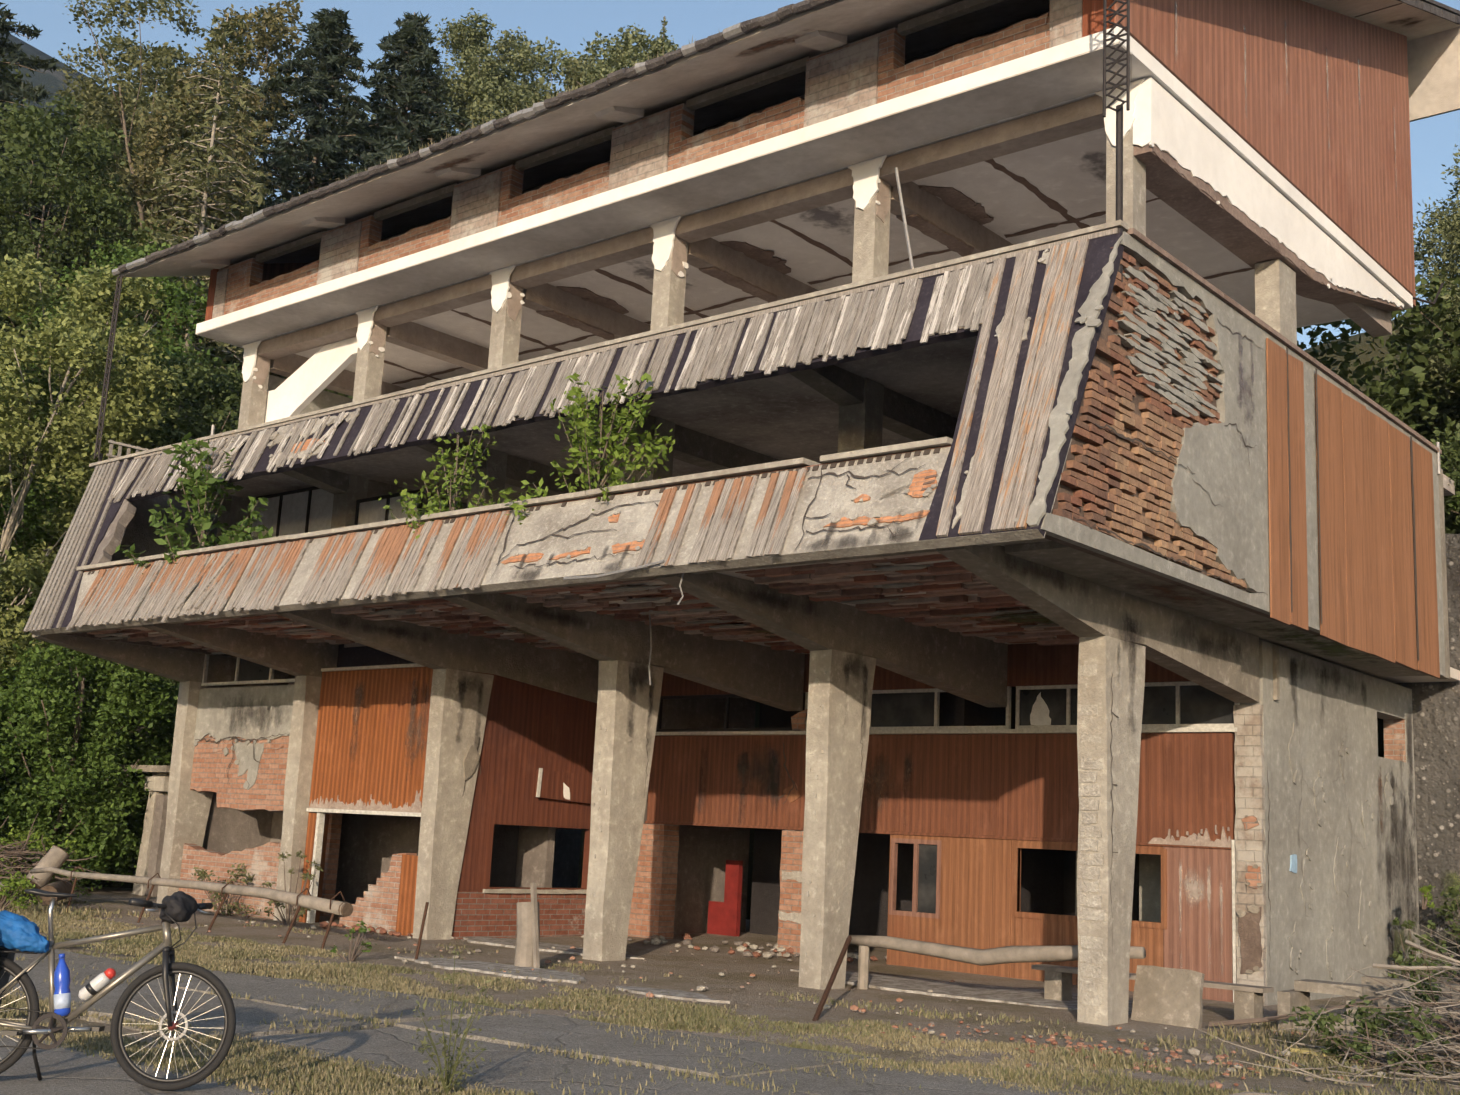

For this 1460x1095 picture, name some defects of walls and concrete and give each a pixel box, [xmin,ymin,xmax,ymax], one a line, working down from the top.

spalling [1013,235,1247,589]
crack [492,501,658,576]
crack [795,457,925,549]
spalling [735,551,1079,646]
peeling [194,733,290,790]
spalling [1237,864,1264,974]